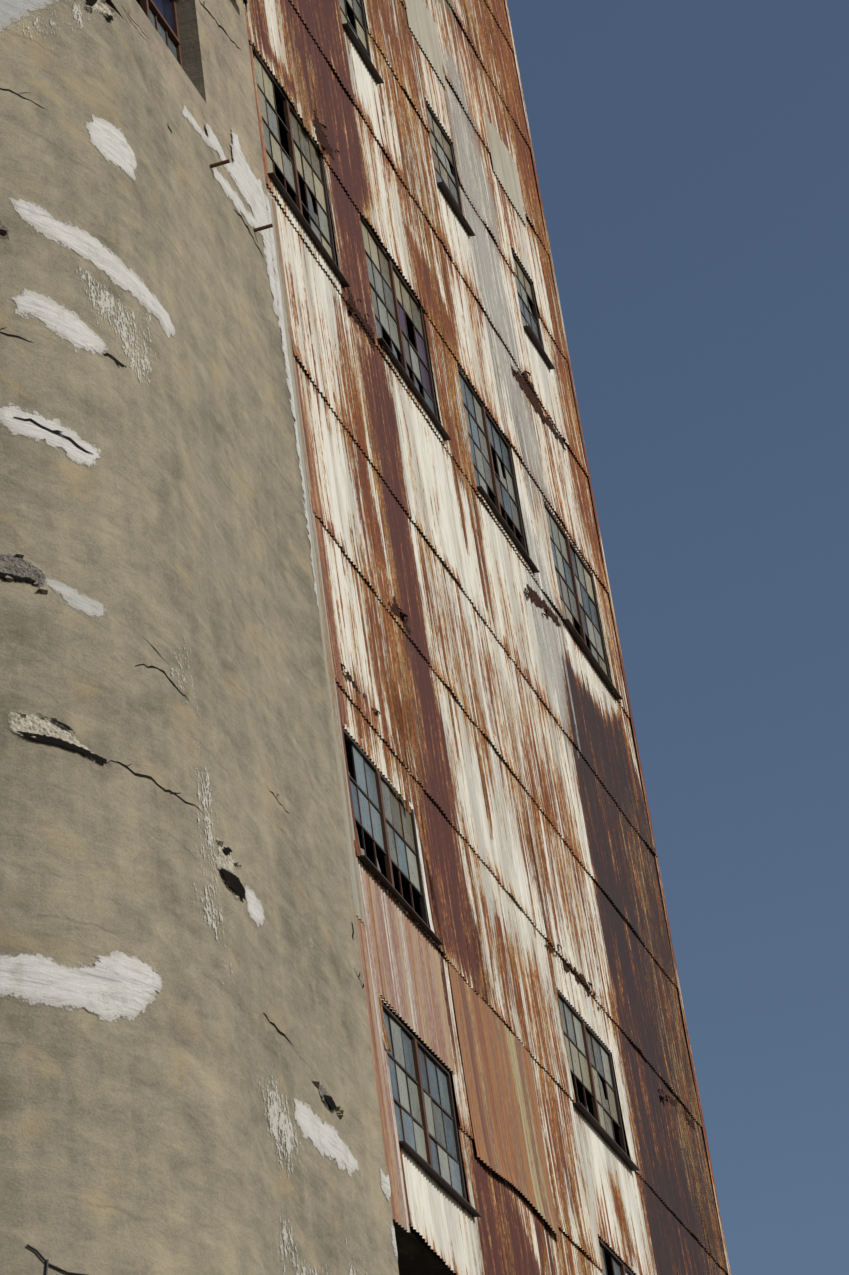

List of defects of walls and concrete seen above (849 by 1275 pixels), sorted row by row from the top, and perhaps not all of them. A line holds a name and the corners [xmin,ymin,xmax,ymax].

spalling [0,552,48,594]
rust [241,0,728,1275]
crack [135,639,188,699]
spalling [8,711,107,764]
crack [106,760,205,816]
spalling [216,838,246,902]
spalling [312,1078,344,1119]